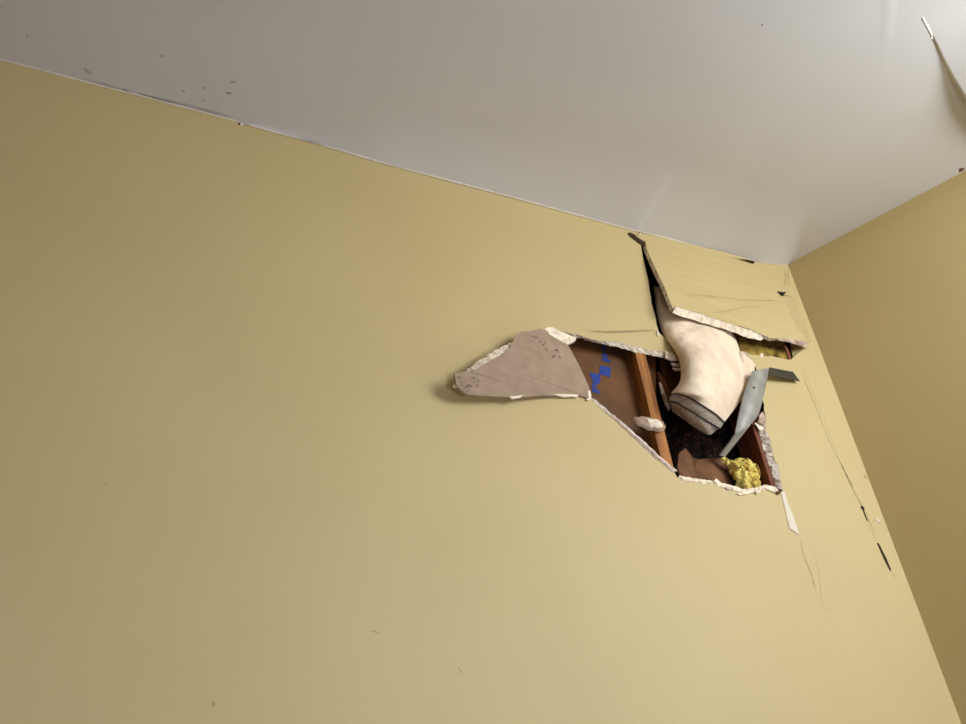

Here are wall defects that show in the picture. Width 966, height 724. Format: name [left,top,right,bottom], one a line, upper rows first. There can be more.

peeling [544,327,576,345]
peeling [665,351,681,371]
peeling [554,391,591,401]
crack [877,543,891,571]